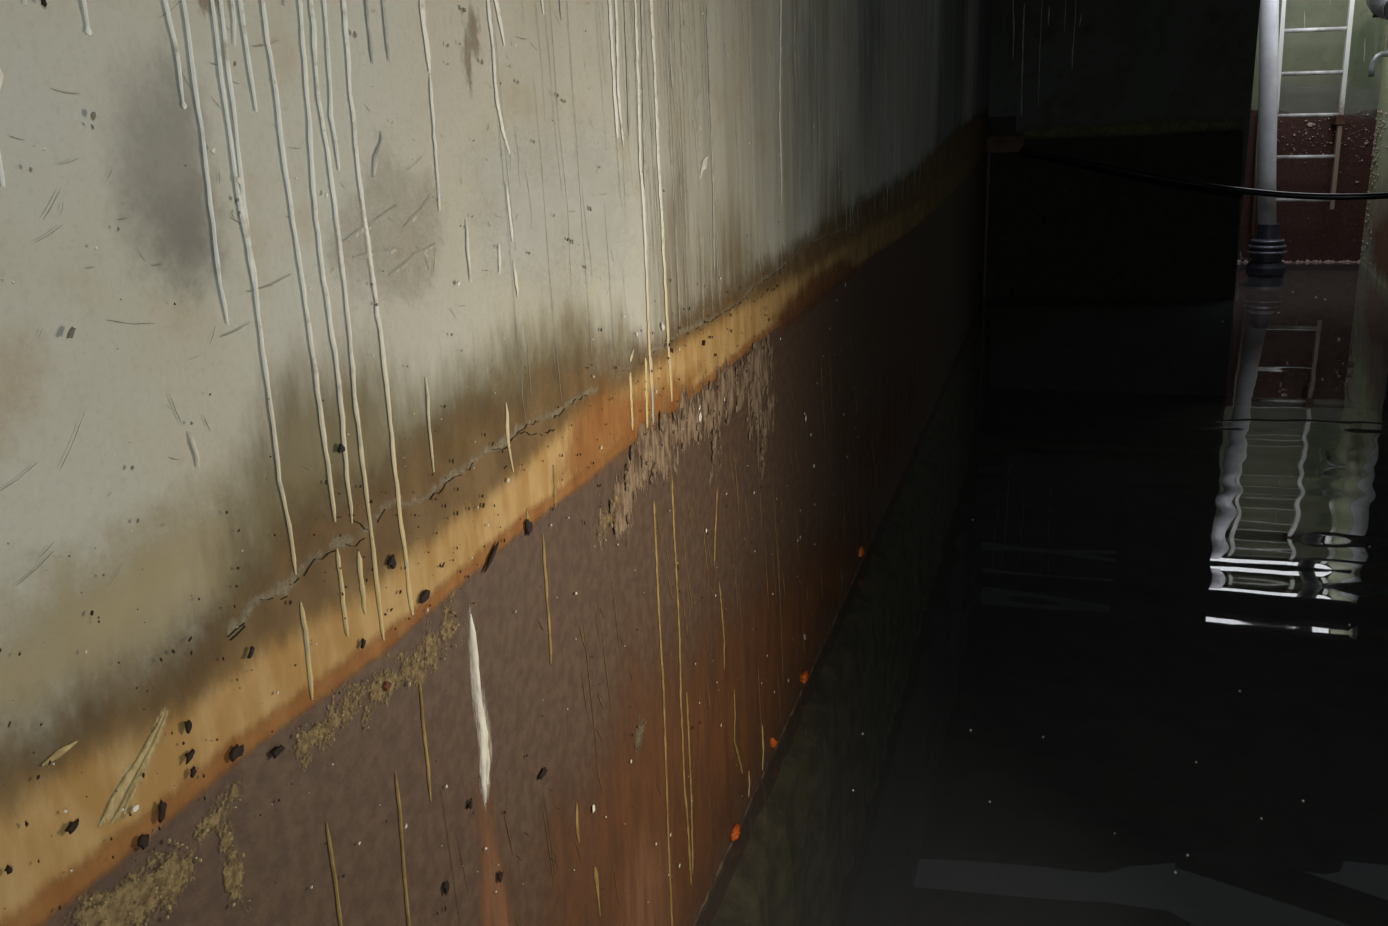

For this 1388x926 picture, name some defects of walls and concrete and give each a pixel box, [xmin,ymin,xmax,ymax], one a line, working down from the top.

leakage [0,0,635,713]
crack [227,388,597,641]
rust [0,110,989,926]
leakage [34,110,1258,926]
leakage [596,0,740,343]